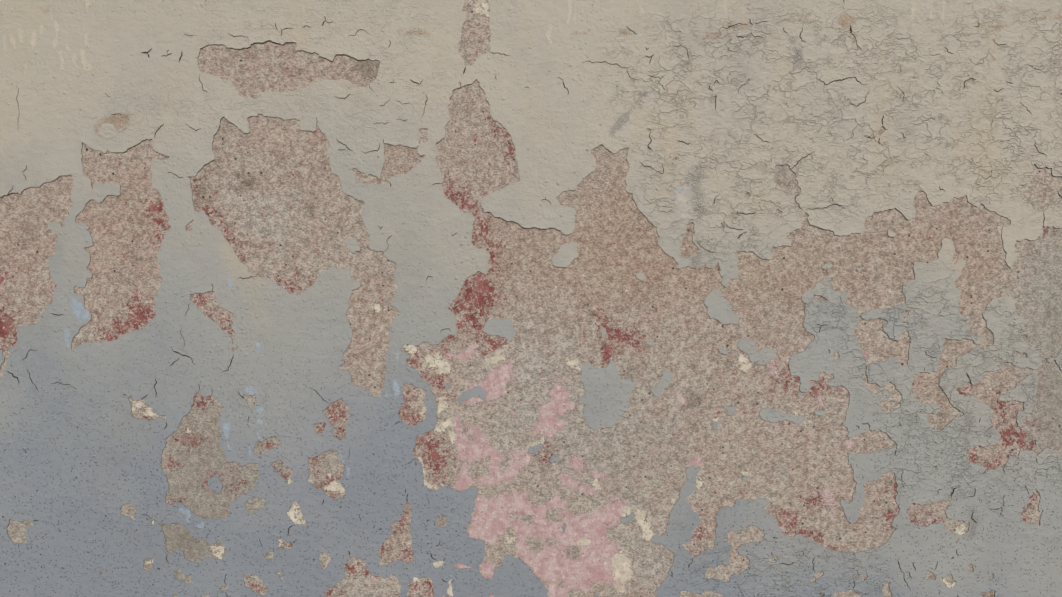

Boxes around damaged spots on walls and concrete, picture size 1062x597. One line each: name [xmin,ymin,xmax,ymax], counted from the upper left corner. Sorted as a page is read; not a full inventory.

peeling [458,0,491,67]
crack [723,20,804,42]
peeling [198,40,380,99]
crack [820,77,935,144]
crack [963,64,1039,113]
crack [714,193,842,239]
peeling [0,139,171,378]
peeling [186,80,1062,597]
peeling [128,397,167,421]
peeling [160,391,293,519]